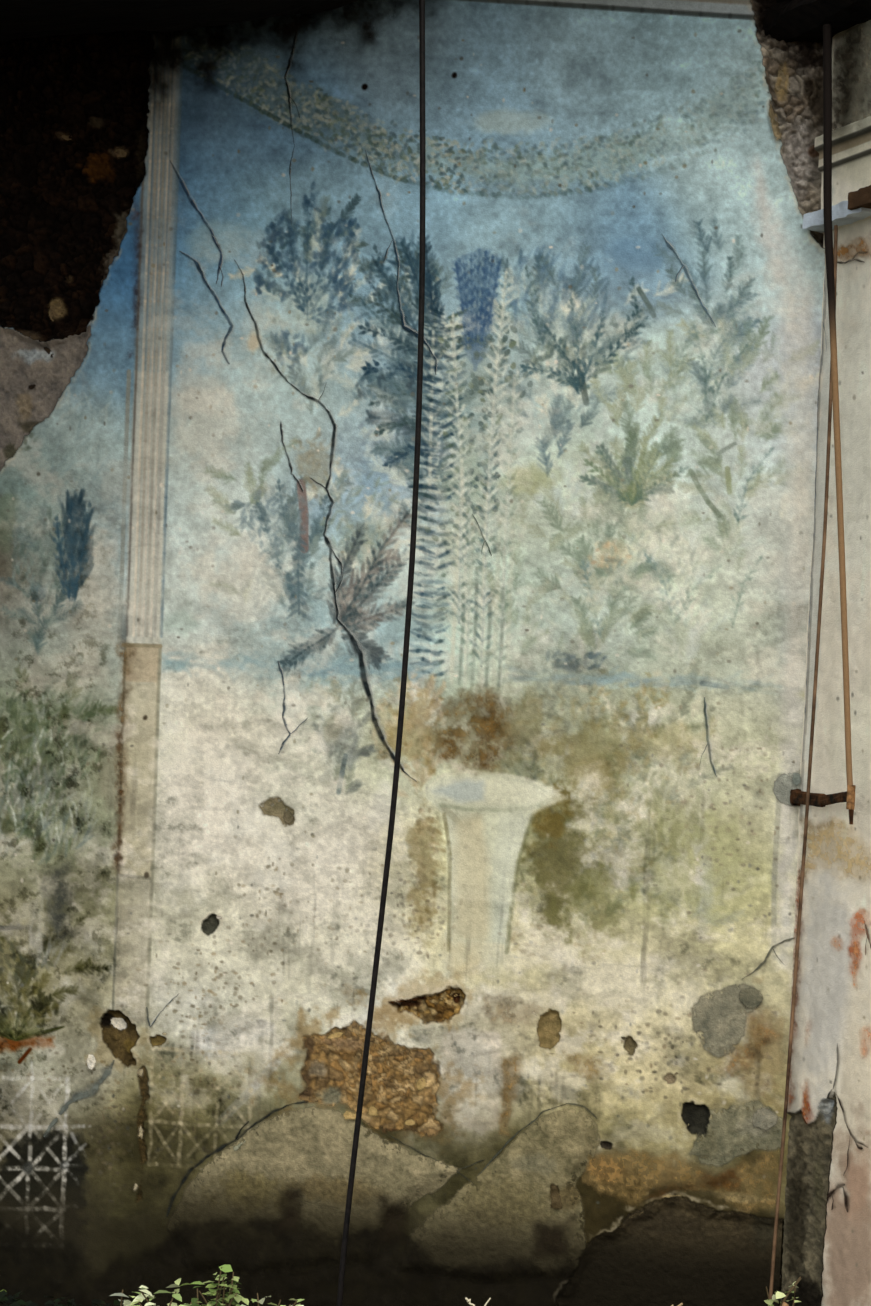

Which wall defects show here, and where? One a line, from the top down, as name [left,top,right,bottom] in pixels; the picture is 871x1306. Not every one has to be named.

flaking render [750,0,823,216]
flaking render [0,30,154,471]
crack [365,150,437,375]
crack [170,161,417,782]
spalling [389,987,465,1024]
rust [839,911,865,985]
flaking render [100,1010,166,1164]
crack [166,1101,307,1217]
leakage [0,1189,575,1306]
crack [389,1103,597,1185]
leakage [587,1150,779,1210]
flaking render [557,1092,837,1306]